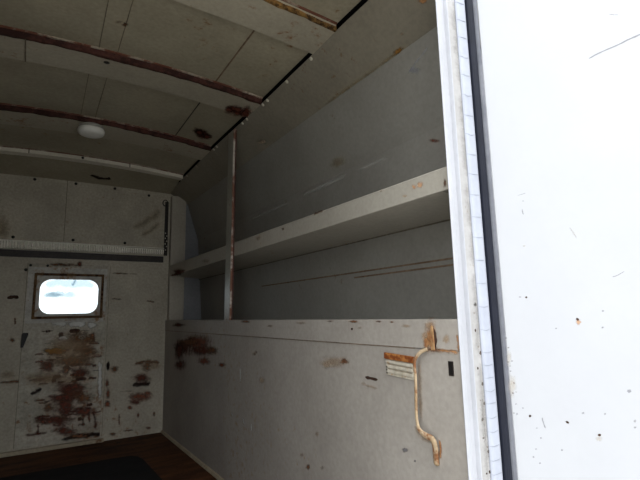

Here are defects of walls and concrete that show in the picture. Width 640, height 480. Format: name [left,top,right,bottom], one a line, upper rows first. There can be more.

corrosion [264,0,337,32]
corrosion [0,27,262,118]
corrosion [0,104,211,151]
corrosion [229,129,237,320]
corrosion [175,336,216,370]
corrosion [384,352,414,363]
corrosion [424,324,459,354]
corrosion [27,329,110,440]
corrosion [128,360,159,417]